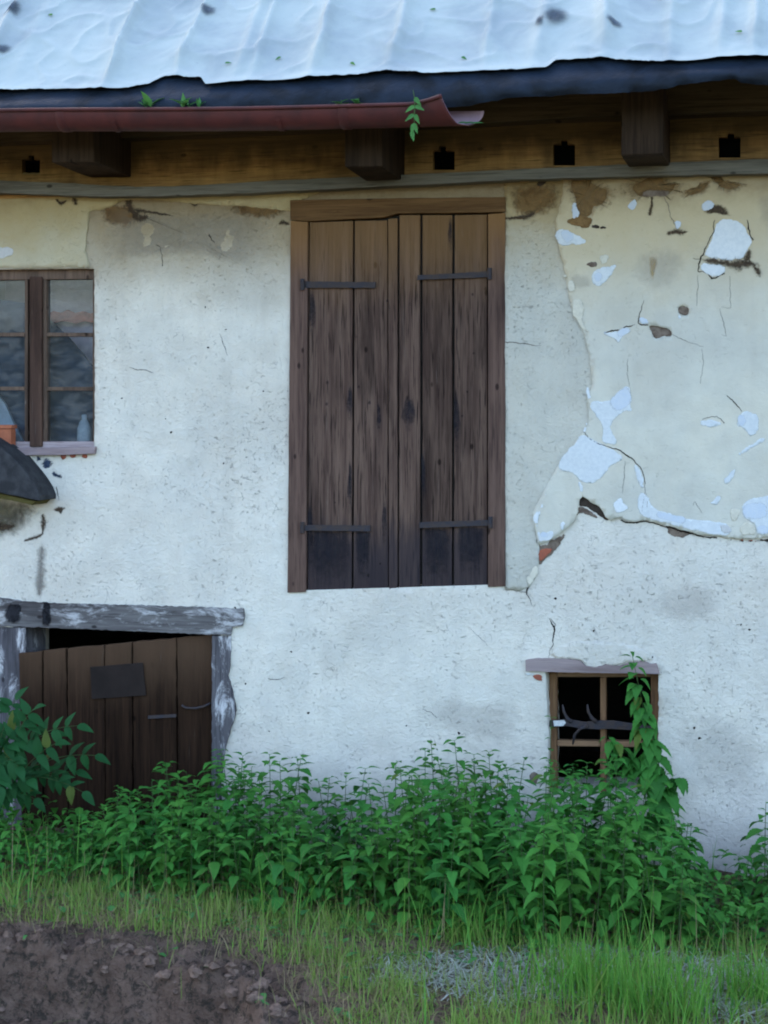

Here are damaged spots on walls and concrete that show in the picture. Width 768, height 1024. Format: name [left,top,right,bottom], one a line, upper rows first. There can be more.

spalling [555,180,607,246]
spalling [628,177,740,211]
peeling [587,255,616,286]
peeling [701,219,752,277]
spalling [639,317,672,339]
crack [585,433,717,539]
peeling [559,386,768,542]
spalling [527,494,565,585]
crack [514,587,556,658]